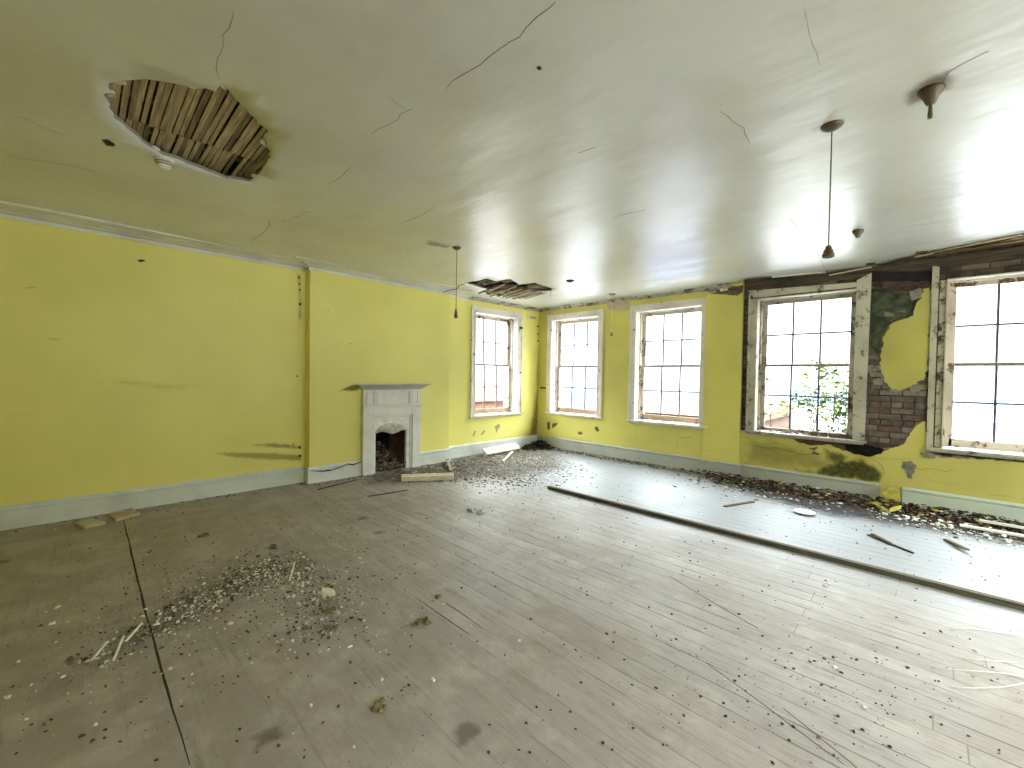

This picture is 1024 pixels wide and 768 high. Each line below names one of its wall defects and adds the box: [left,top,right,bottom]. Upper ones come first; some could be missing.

crack [216,14,234,80]
crack [446,9,548,89]
water stain [869,289,918,355]
spalling [871,281,930,329]
spalling [794,342,927,457]
water stain [818,453,881,481]
spalling [901,451,936,479]